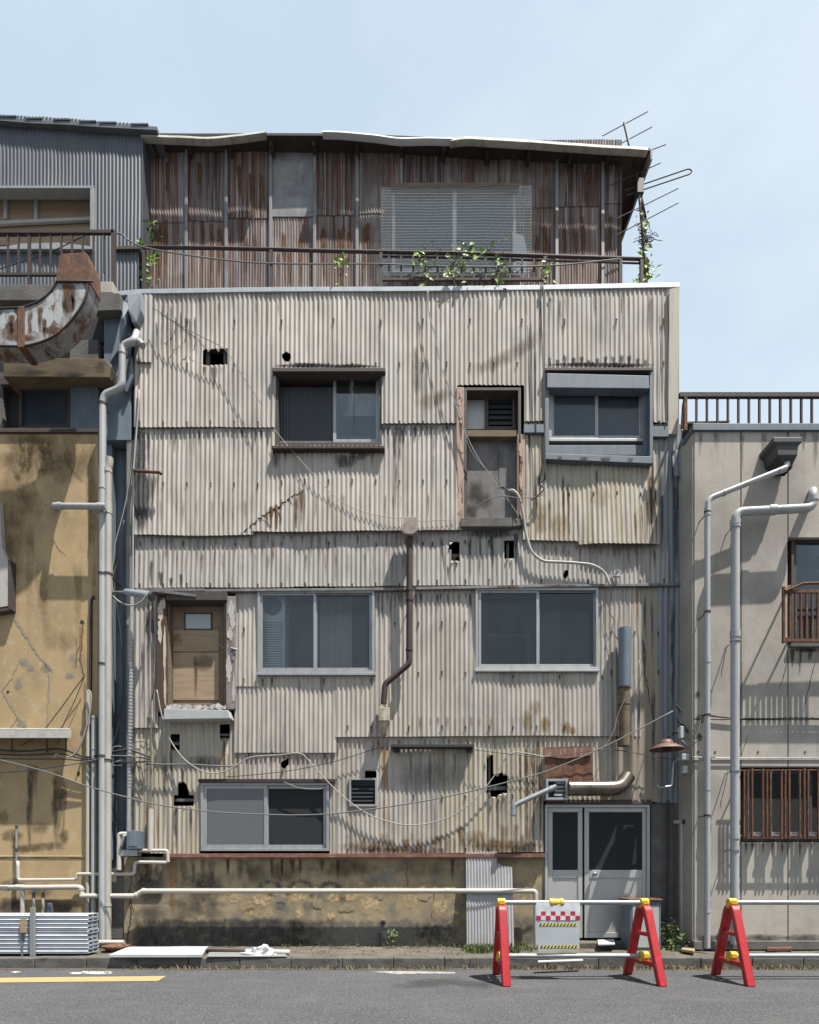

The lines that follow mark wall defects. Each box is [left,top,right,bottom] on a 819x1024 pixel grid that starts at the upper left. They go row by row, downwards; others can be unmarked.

rust [6,308,66,340]
rust [62,284,75,312]
rust [266,479,306,556]
rust [520,479,570,526]
rust [634,476,657,533]
crack [1,614,52,728]
crack [76,623,84,675]
rust [377,741,388,820]
leakage [135,862,463,947]